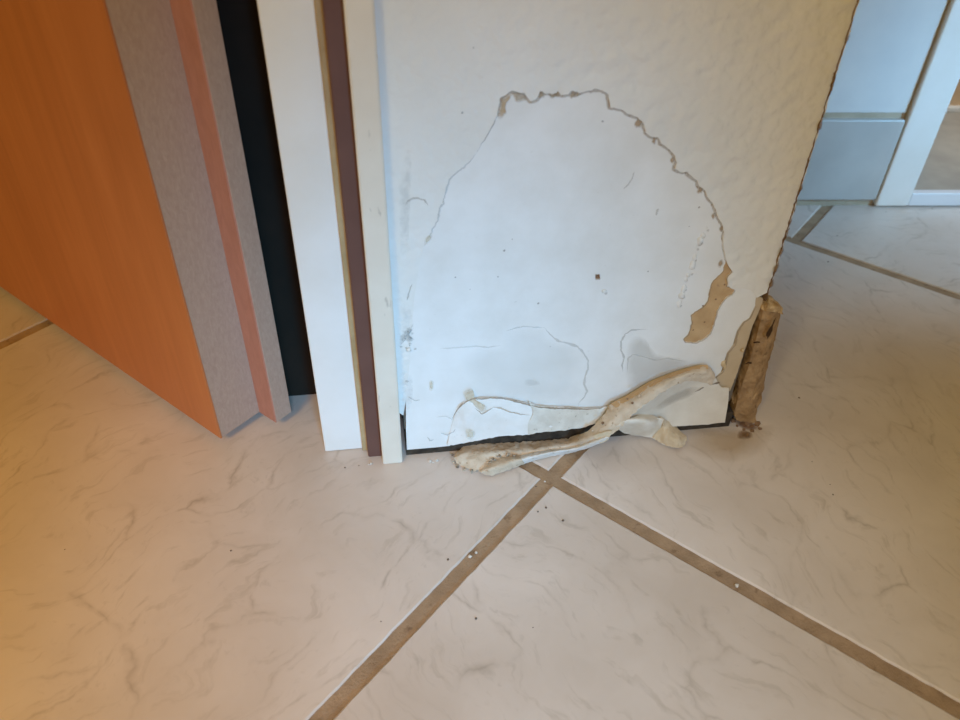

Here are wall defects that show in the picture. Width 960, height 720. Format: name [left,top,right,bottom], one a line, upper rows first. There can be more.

peeling [406,0,859,476]